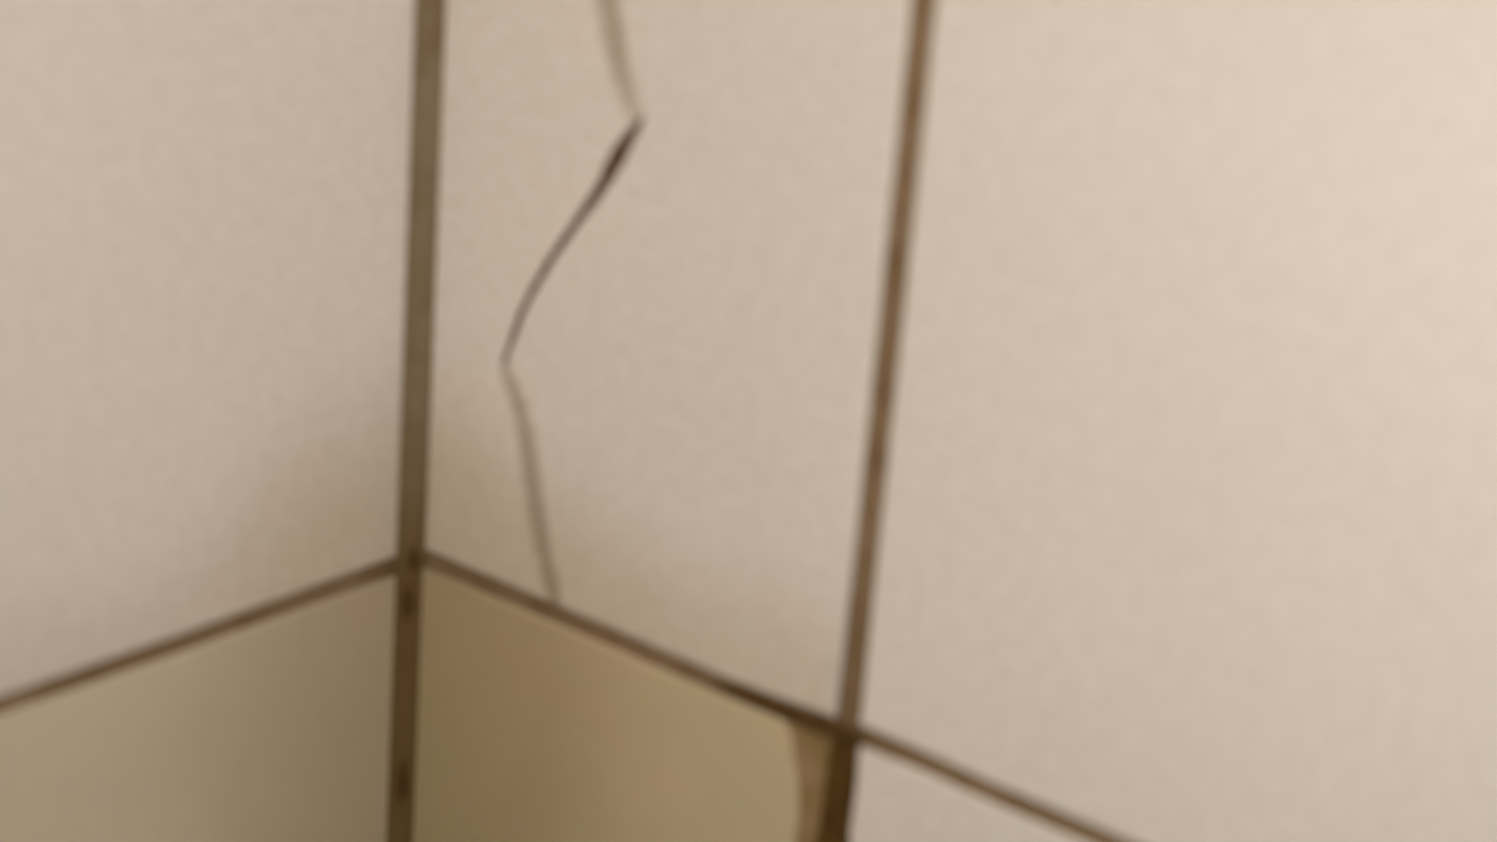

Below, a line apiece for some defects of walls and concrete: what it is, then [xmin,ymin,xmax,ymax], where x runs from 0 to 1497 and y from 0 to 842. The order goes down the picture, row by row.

crack [503,116,644,365]